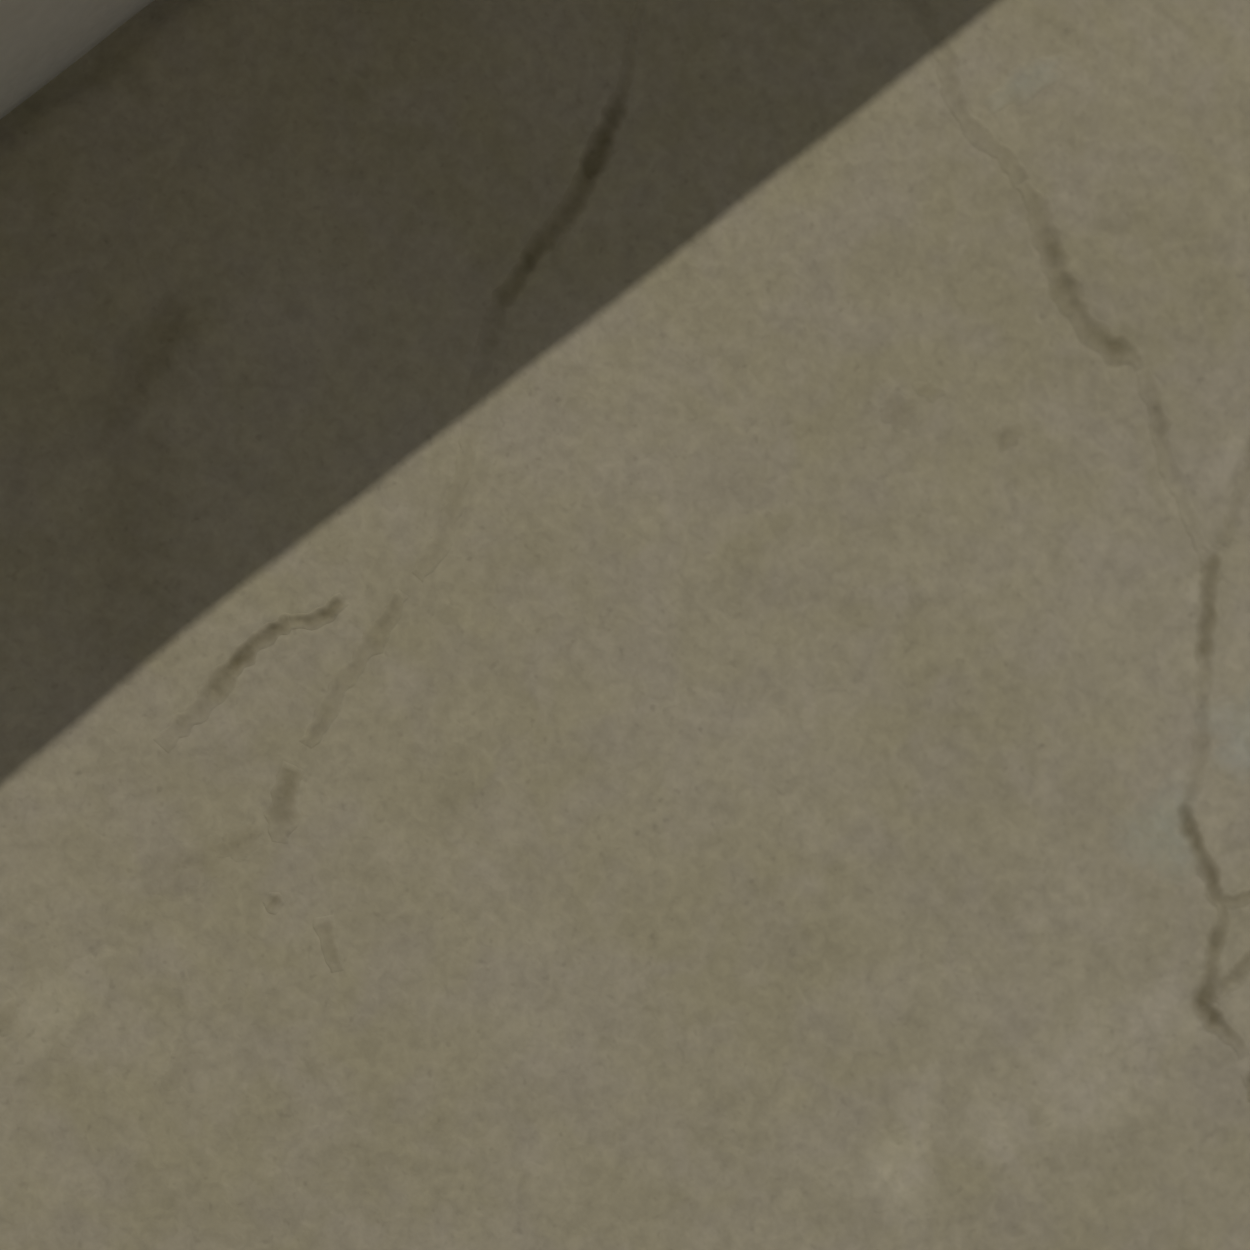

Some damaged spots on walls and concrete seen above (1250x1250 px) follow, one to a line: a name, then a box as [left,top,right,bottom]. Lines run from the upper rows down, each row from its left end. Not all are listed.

crack [153,0,648,844]
crack [892,0,1250,1103]